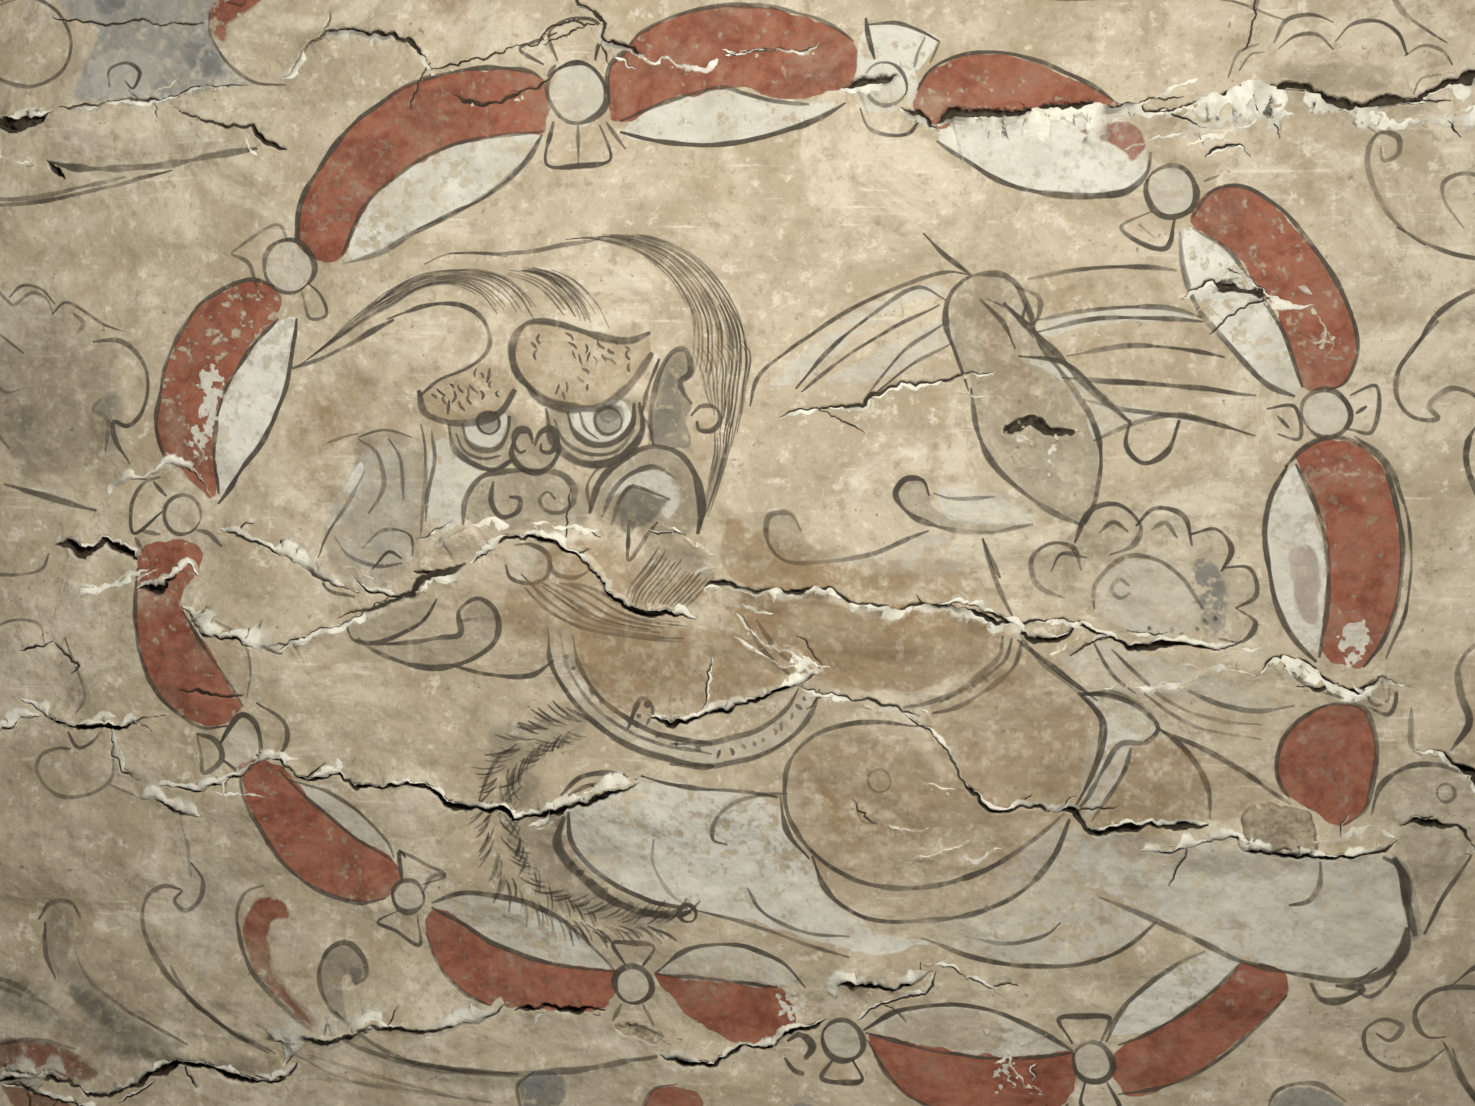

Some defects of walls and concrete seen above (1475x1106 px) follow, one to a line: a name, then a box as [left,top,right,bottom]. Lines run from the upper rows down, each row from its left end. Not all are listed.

crack [0,0,819,182]
crack [841,0,1475,157]
crack [1181,267,1335,350]
spalling [1002,414,1079,477]
crack [0,454,1475,887]
crack [0,1002,605,1106]
crack [660,958,1019,1073]
crack [994,1050,1047,1106]